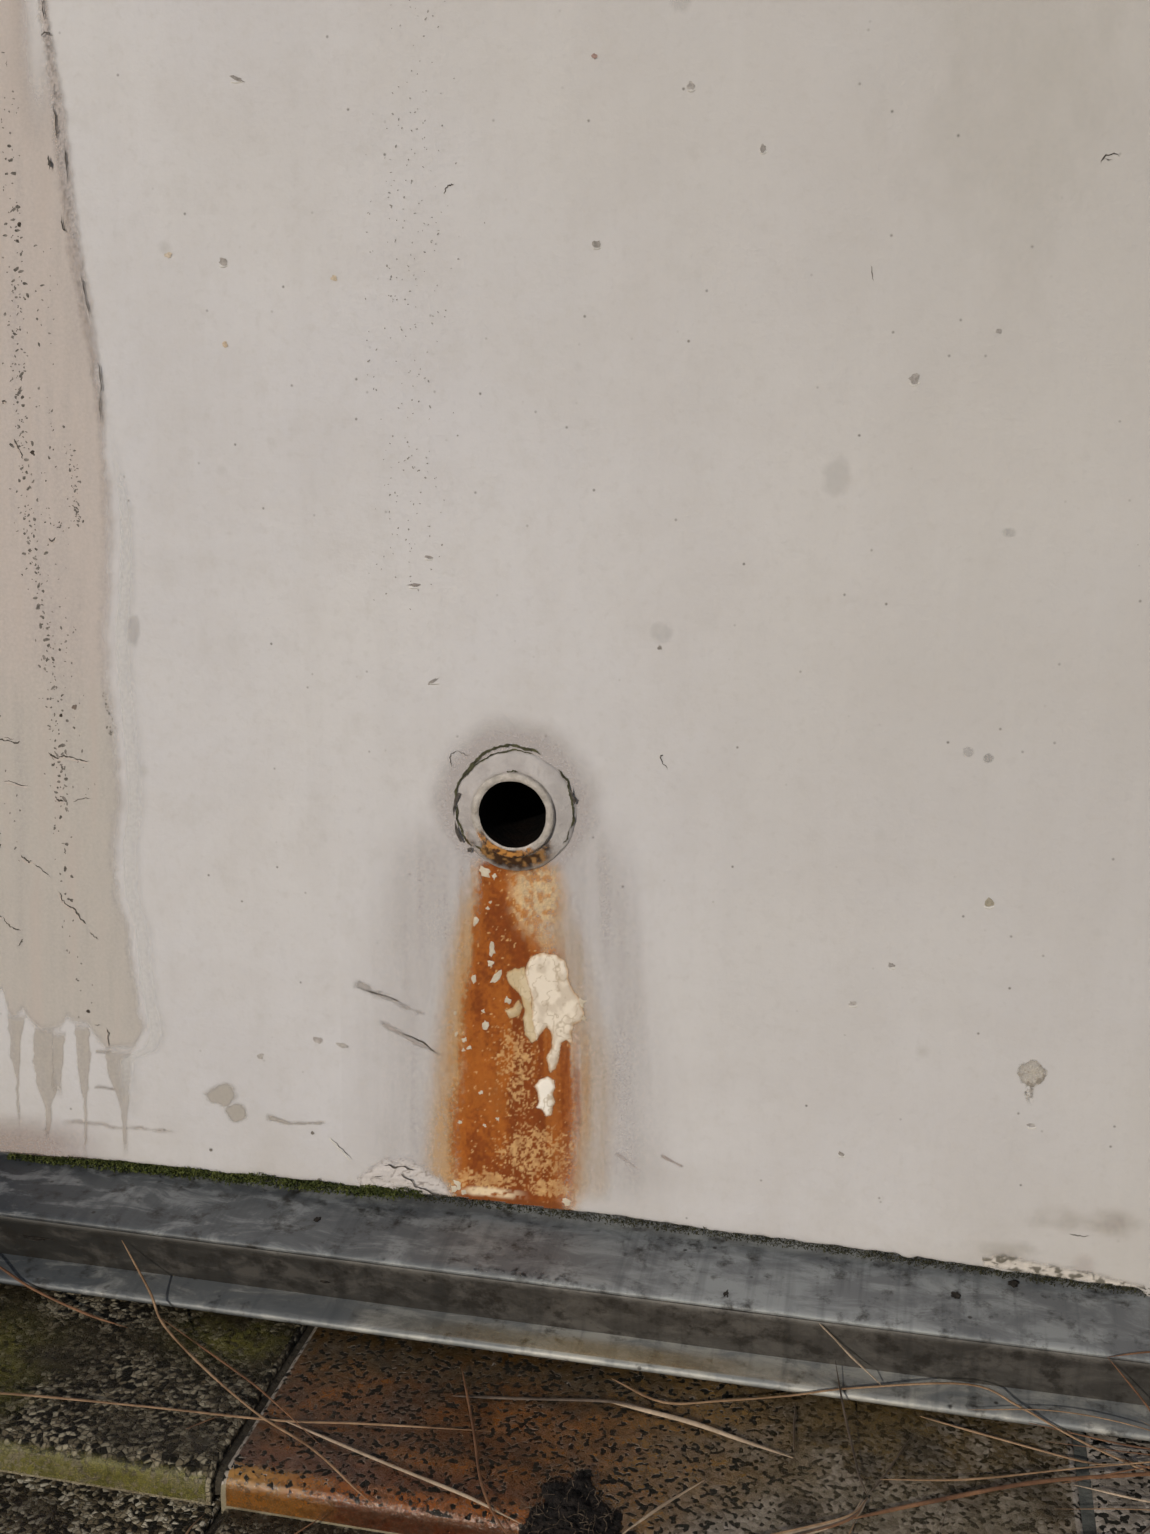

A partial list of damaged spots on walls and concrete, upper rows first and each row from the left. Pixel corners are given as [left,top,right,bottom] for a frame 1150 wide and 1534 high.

water stain [0,0,159,1143]
rust [434,832,583,1209]